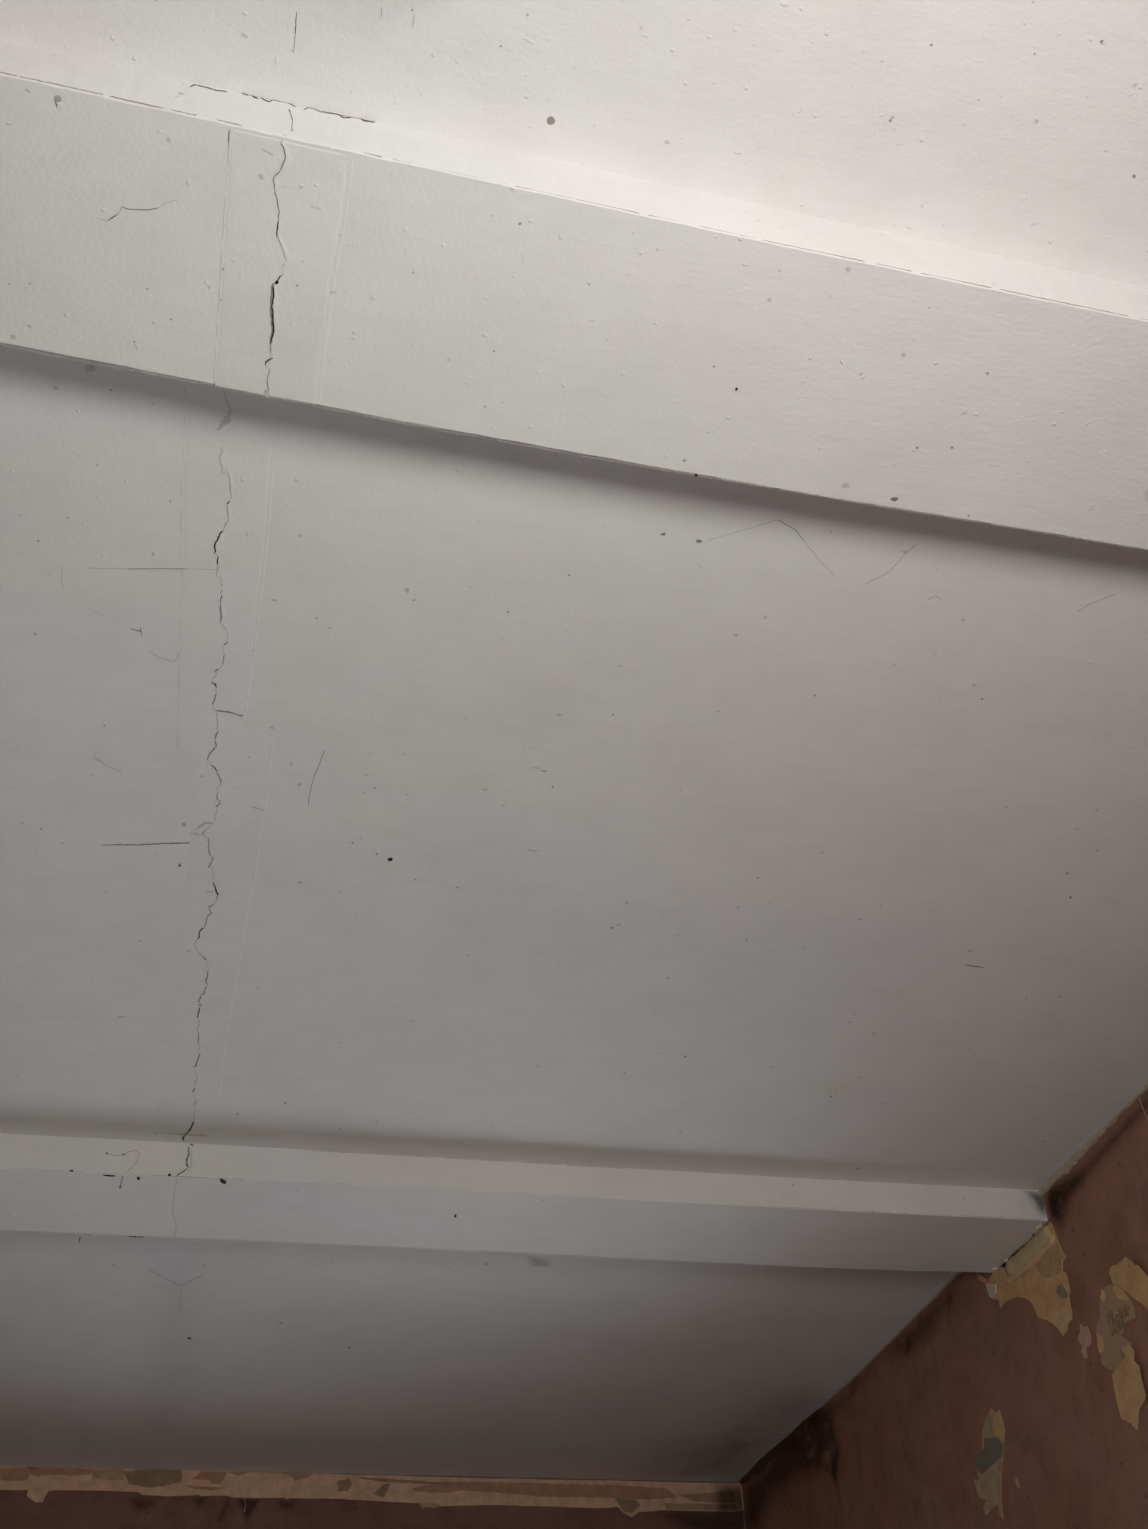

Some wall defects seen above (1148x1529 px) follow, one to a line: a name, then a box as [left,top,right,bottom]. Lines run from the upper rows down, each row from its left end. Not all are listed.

crack [61,84,375,1177]
spalling [976,1222,1148,1431]
peeling [0,1466,744,1518]
peeling [973,1408,1020,1519]